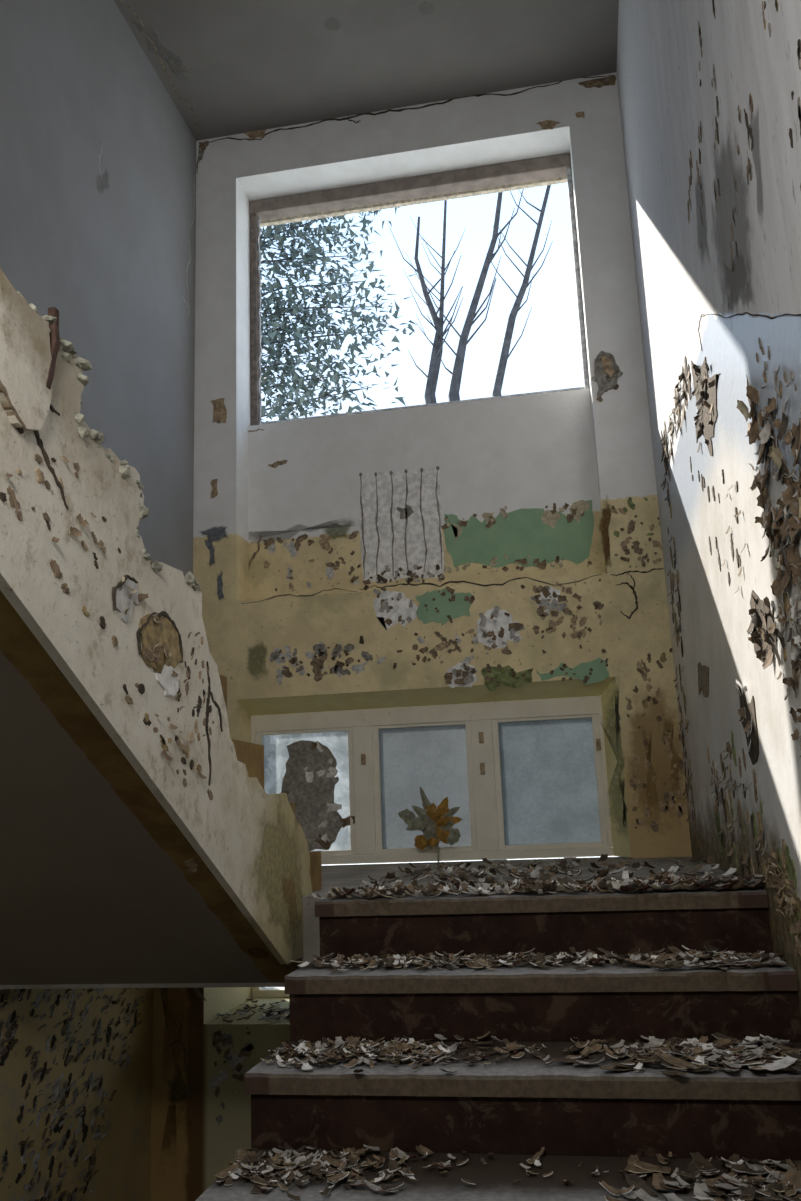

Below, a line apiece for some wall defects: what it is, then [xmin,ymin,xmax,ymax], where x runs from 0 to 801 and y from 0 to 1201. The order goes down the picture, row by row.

peeling [762,0,778,37]
peeling [687,21,754,272]
peeling [789,91,801,148]
spalling [17,292,92,386]
spalling [591,351,623,402]
peeling [0,454,121,569]
spalling [74,401,162,573]
peeling [397,505,414,519]
peeling [49,559,70,594]
peeling [263,531,608,689]
spalling [82,575,214,800]
peeling [0,988,145,1201]